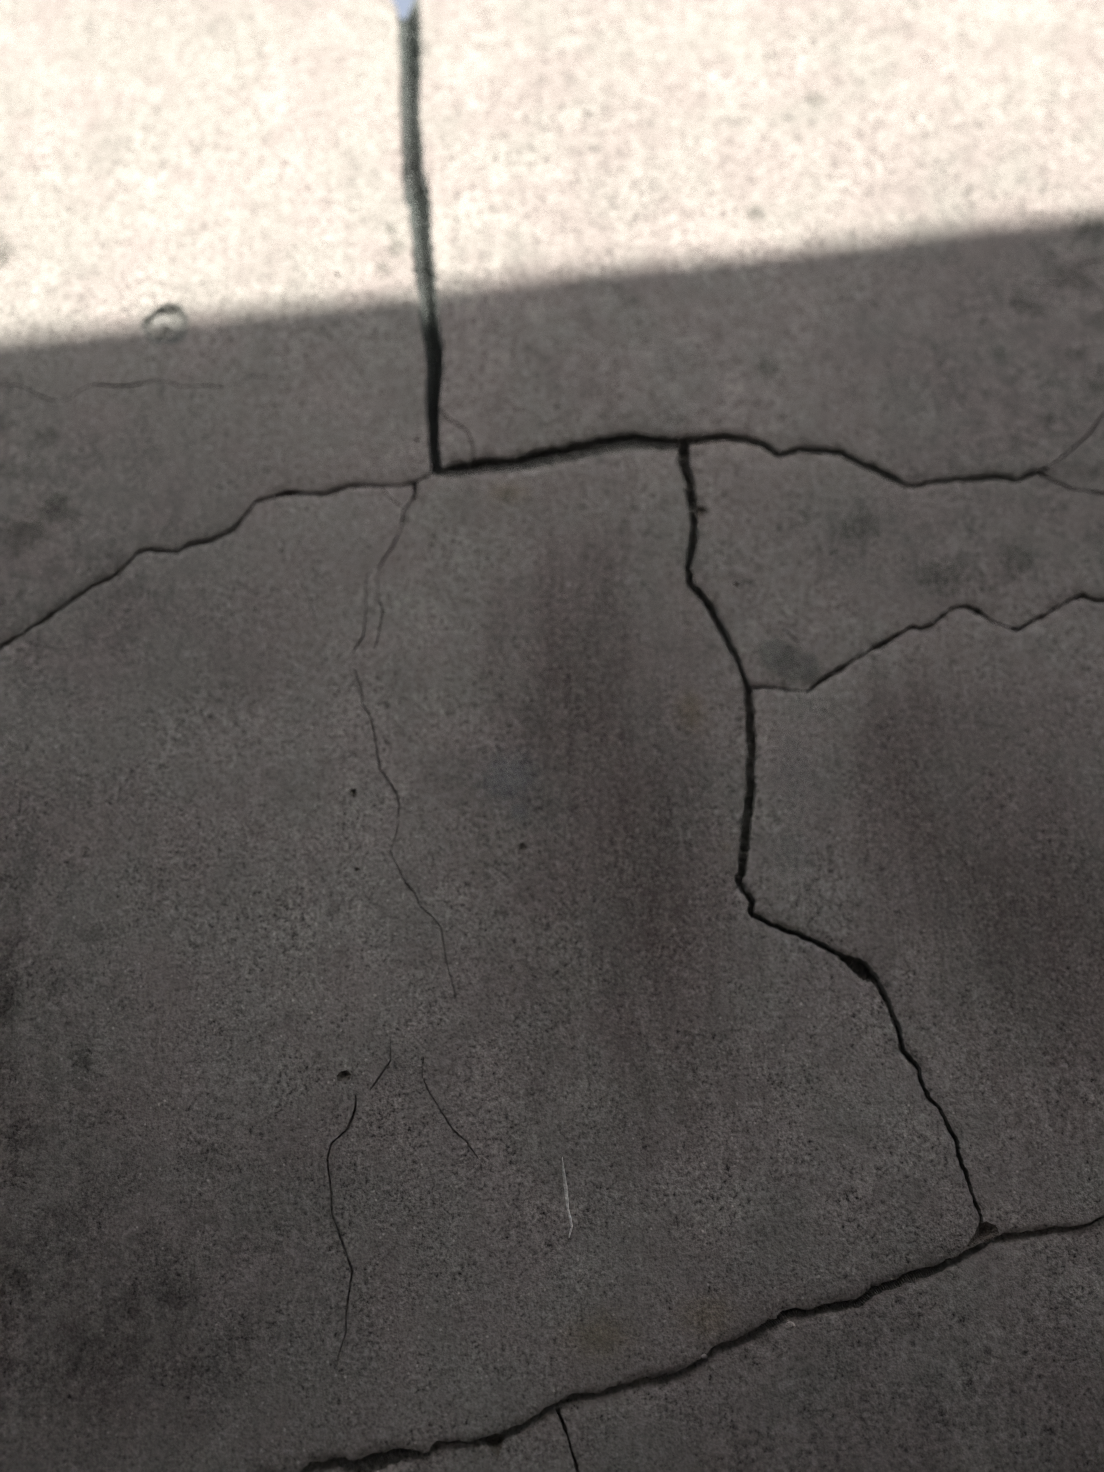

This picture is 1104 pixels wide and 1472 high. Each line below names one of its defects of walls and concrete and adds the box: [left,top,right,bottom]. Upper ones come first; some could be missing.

crack [0,0,1104,656]
crack [353,669,457,1003]
crack [676,442,1104,1223]
crack [326,1042,479,1368]
crack [300,1216,1104,1472]